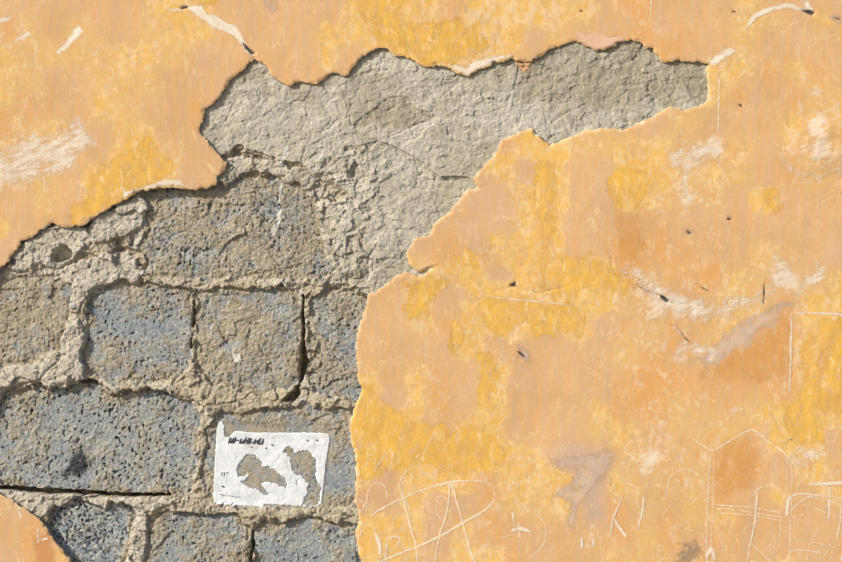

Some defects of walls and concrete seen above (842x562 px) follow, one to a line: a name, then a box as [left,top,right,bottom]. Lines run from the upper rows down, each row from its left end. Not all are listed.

peeling [57,25,84,55]
peeling [666,140,719,211]
spalling [0,32,709,562]